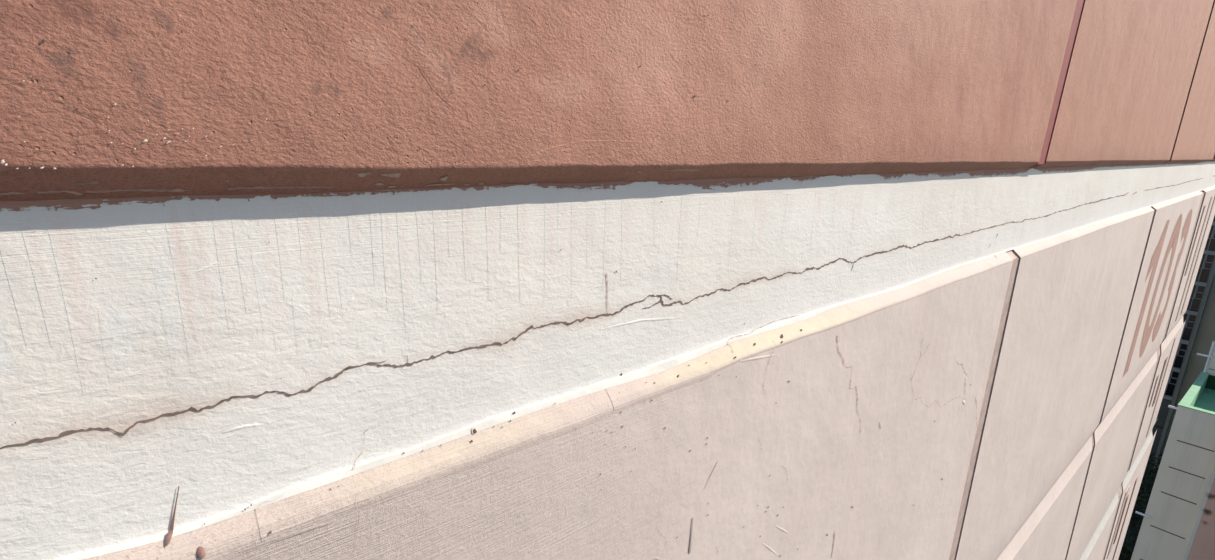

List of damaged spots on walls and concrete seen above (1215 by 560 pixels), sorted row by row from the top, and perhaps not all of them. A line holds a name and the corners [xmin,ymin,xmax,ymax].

crack [0,175,1215,449]